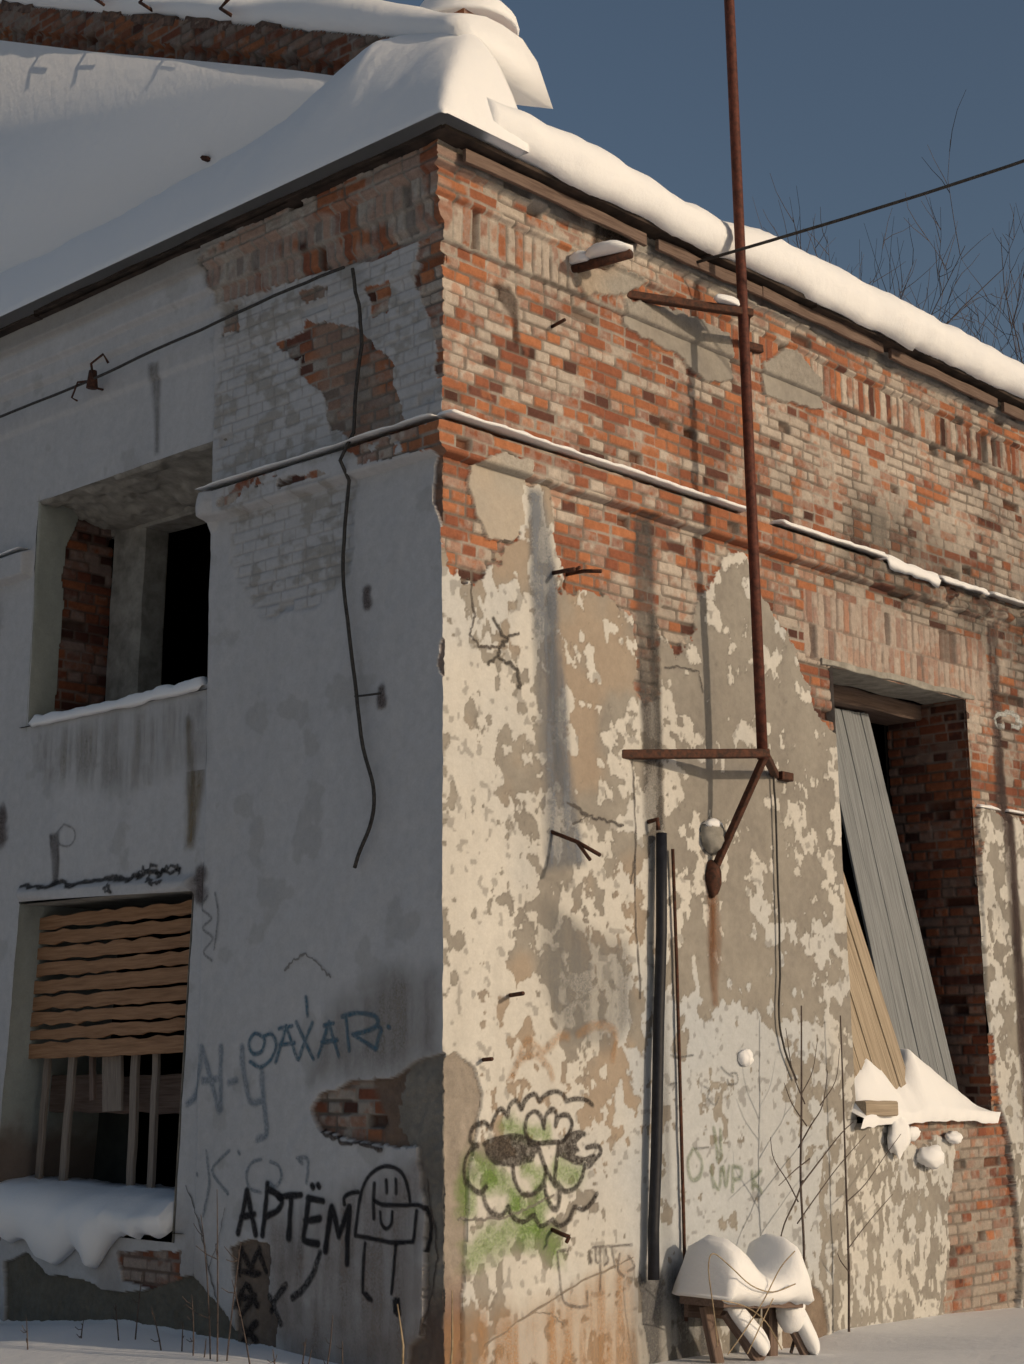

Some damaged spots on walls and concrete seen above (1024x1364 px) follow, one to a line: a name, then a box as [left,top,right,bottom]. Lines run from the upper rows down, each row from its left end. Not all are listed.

crack [467,578,522,689]
damp [530,491,582,865]
spalling [213,222,1024,1364]
spalling [3,1239,278,1347]